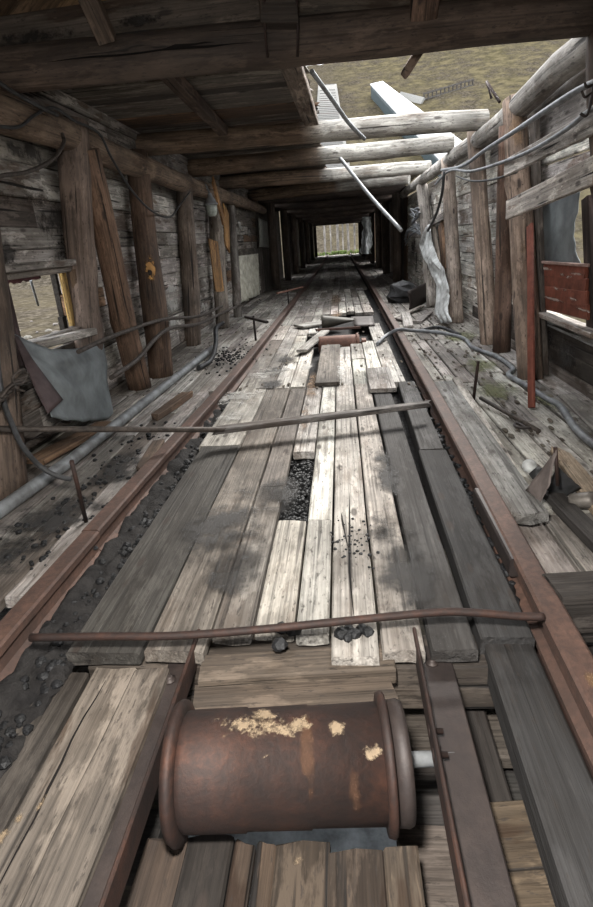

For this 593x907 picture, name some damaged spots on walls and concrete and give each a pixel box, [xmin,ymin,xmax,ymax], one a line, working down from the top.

peeling [230,710,311,737]
peeling [330,722,345,734]
peeling [366,747,381,760]